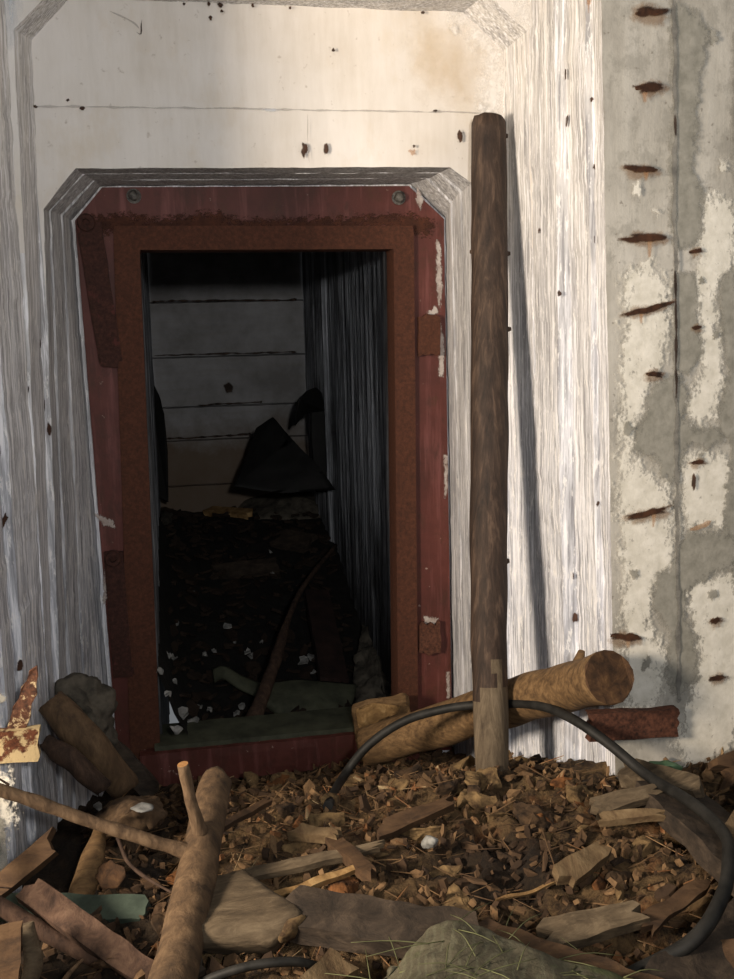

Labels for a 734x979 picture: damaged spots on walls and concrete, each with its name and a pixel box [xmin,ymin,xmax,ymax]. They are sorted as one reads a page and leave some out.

rust [91,209,435,239]
rust [7,660,38,729]